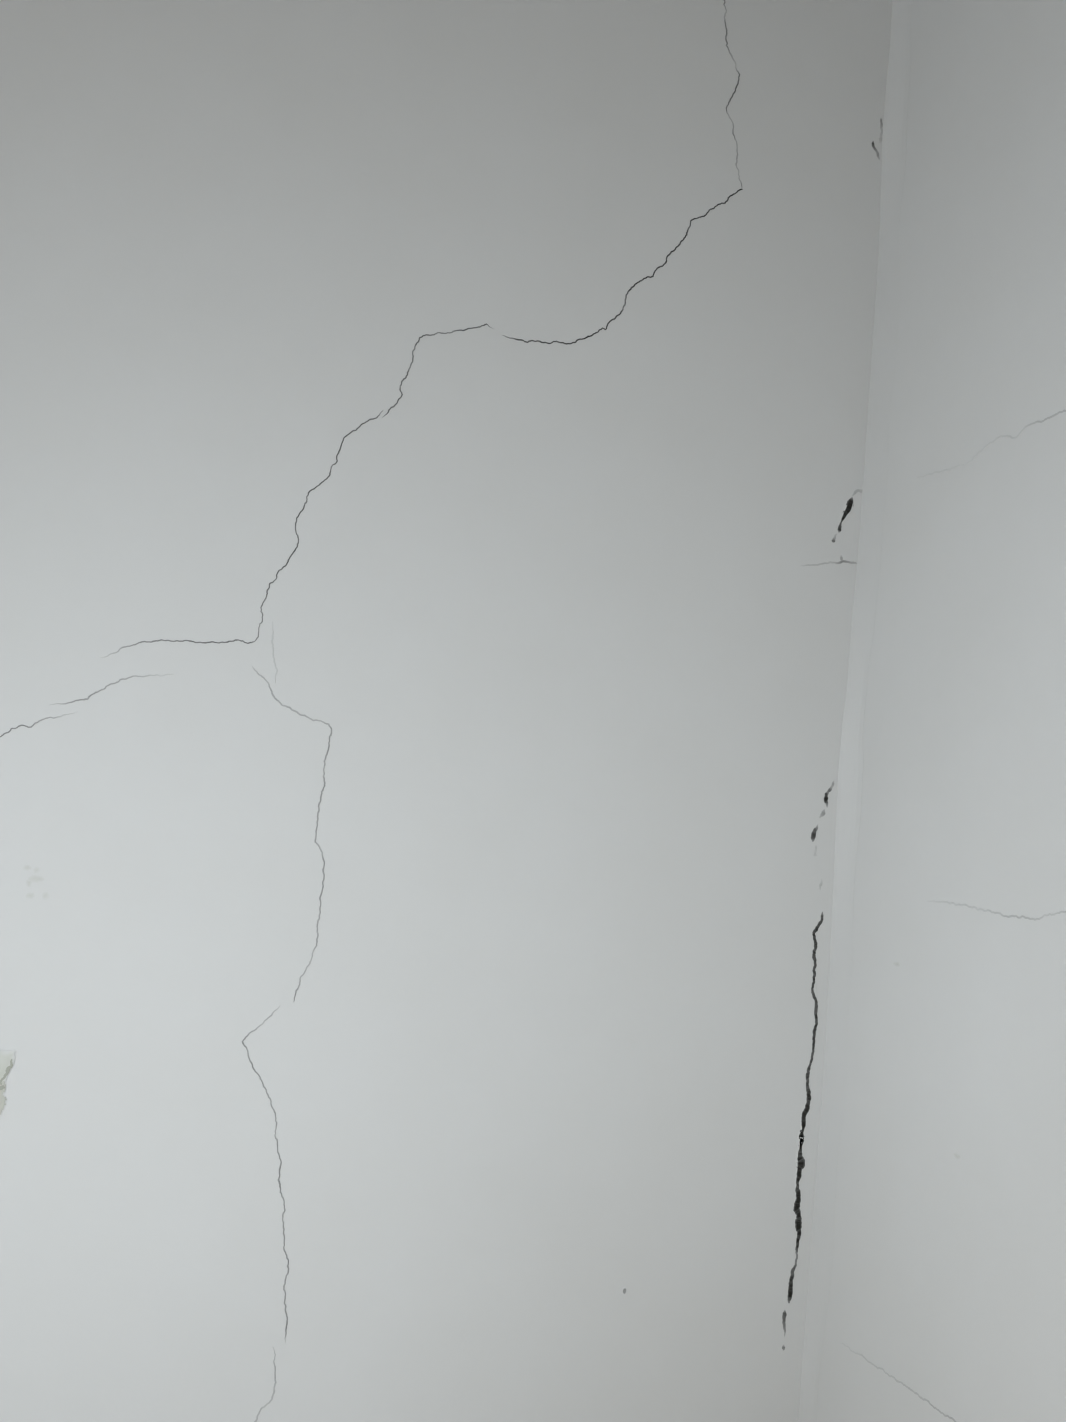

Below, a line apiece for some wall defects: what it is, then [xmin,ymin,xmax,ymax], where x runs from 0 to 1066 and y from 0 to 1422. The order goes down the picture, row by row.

crack [0,0,743,1422]
crack [801,489,863,567]
crack [782,781,834,1351]